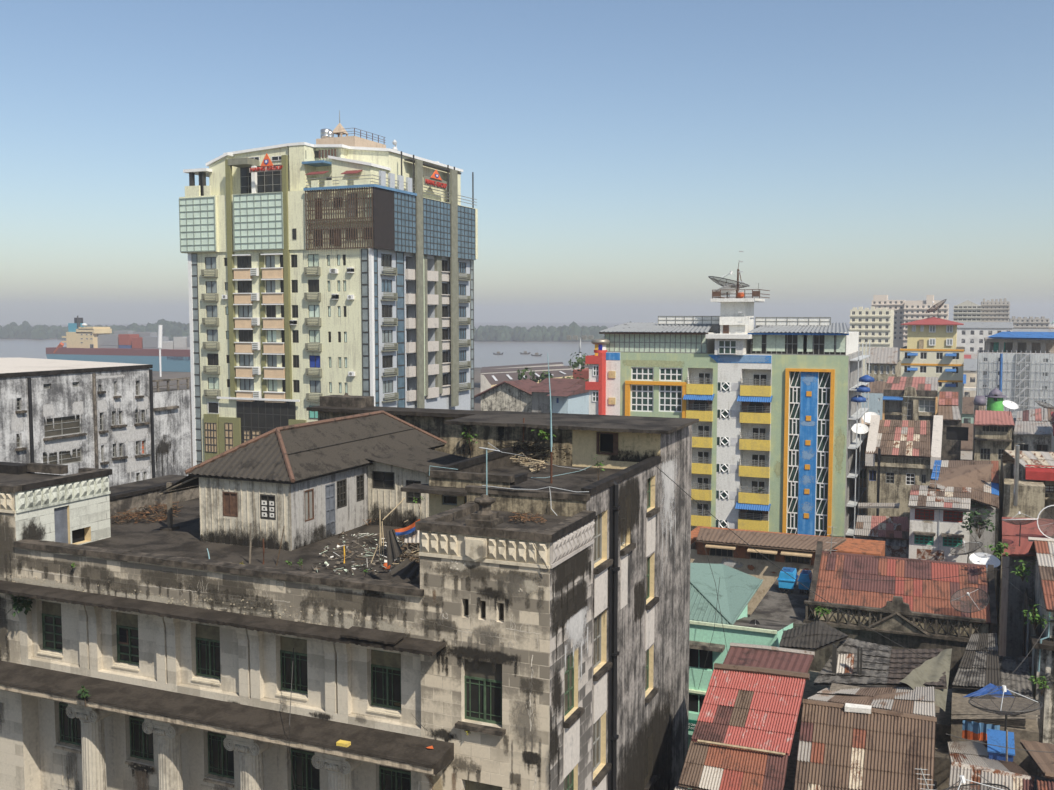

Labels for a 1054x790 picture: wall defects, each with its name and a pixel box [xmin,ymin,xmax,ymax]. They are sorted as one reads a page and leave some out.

leakage [156,435,174,476]
leakage [608,450,677,573]
leakage [0,597,9,661]
leakage [0,515,286,618]
leakage [301,587,407,632]
leakage [420,544,609,790]
leakage [634,581,645,647]
leakage [616,693,674,790]